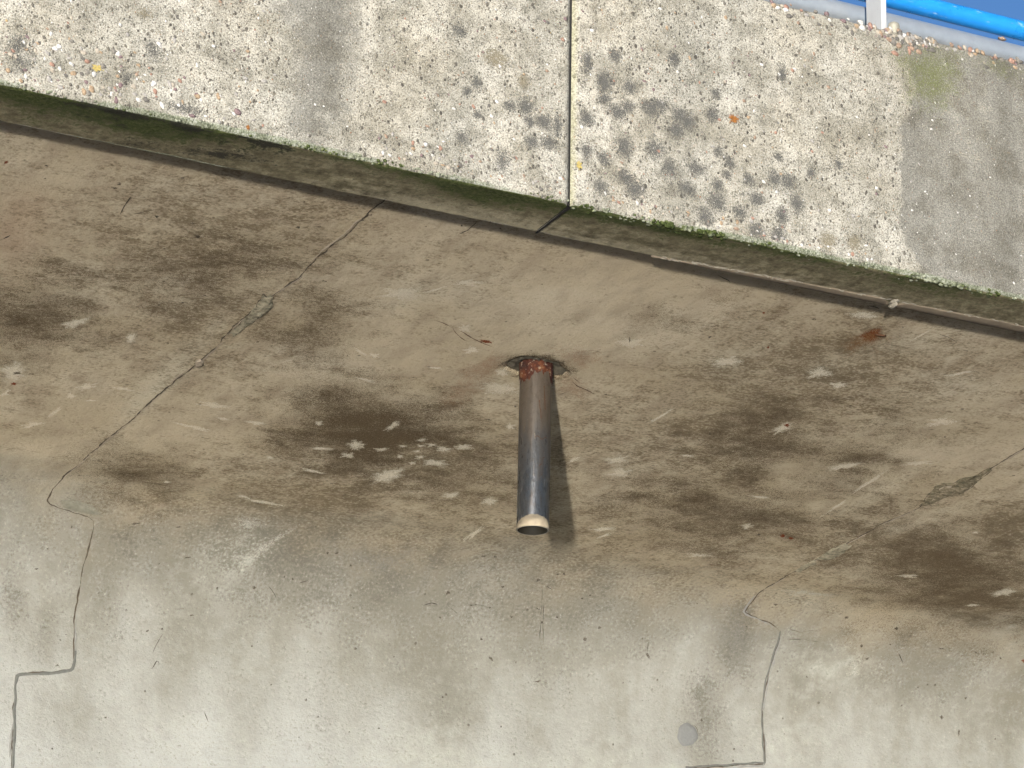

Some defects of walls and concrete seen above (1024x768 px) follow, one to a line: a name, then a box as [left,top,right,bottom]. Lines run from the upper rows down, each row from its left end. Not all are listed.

crack [271,200,385,297]
crack [9,311,251,768]
damp [0,202,549,540]
corrosion [519,359,553,383]
damp [550,353,1024,752]
crack [989,448,1024,470]
crack [685,559,819,768]